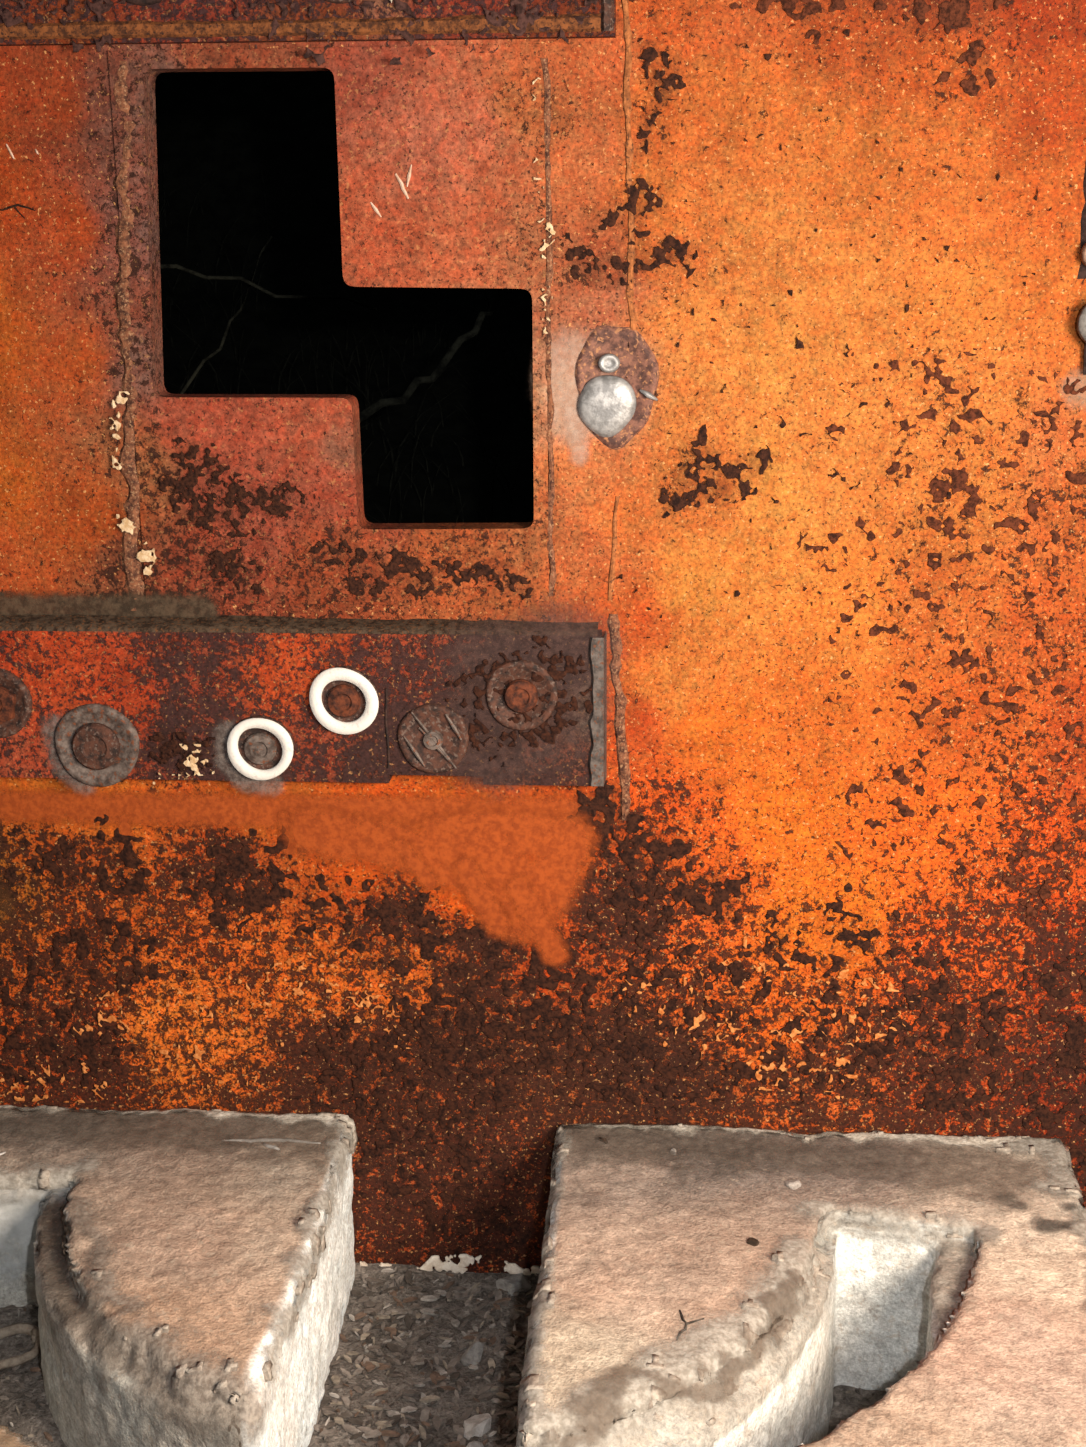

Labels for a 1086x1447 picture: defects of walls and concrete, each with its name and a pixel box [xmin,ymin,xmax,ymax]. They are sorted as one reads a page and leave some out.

rust [287,806,598,965]